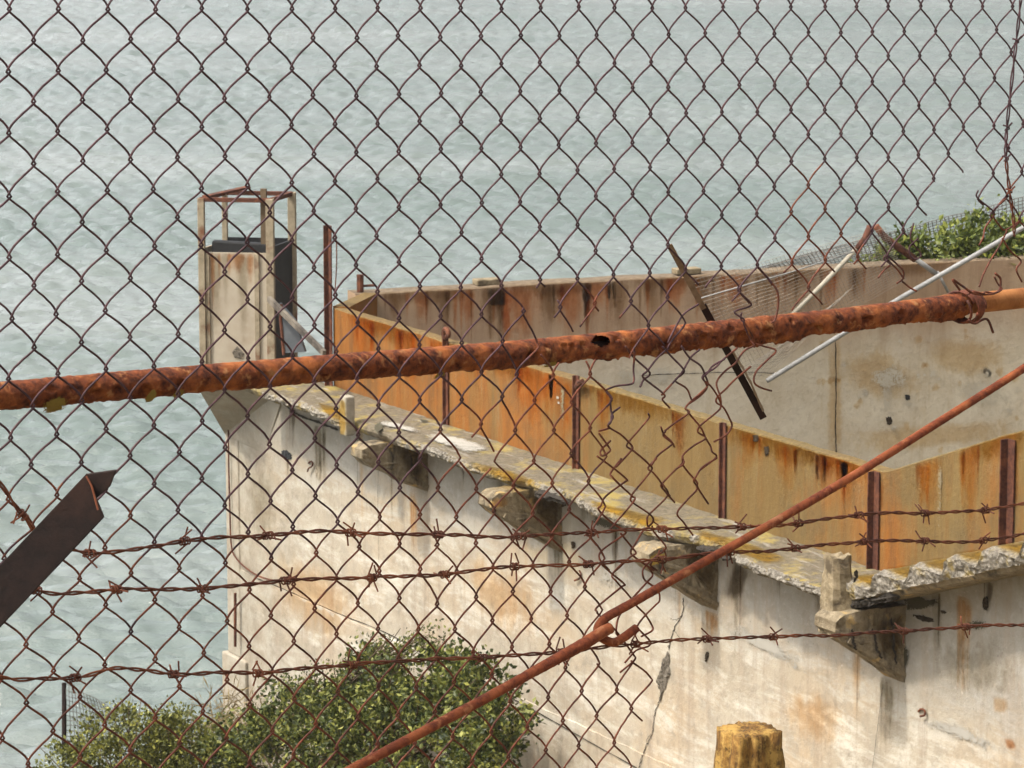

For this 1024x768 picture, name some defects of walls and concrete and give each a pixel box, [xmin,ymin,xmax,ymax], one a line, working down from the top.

crack [669,599,684,648]
spalling [850,593,900,609]